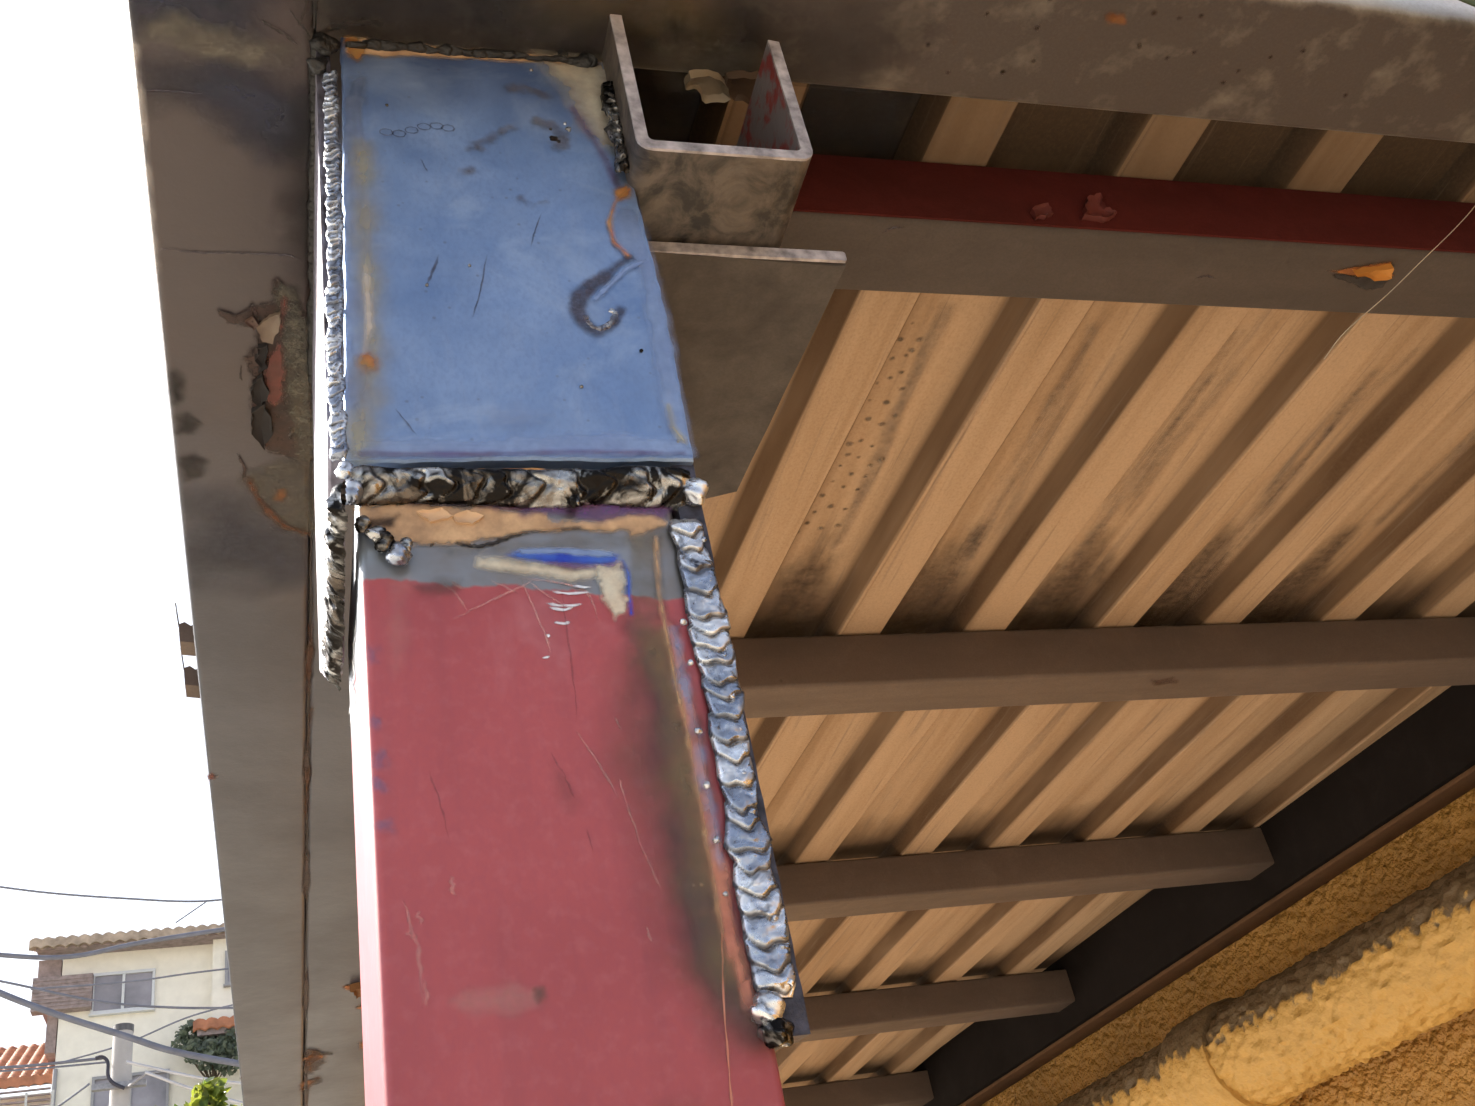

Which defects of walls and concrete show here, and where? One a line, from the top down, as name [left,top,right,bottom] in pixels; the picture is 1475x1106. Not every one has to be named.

peeling [217,279,314,461]